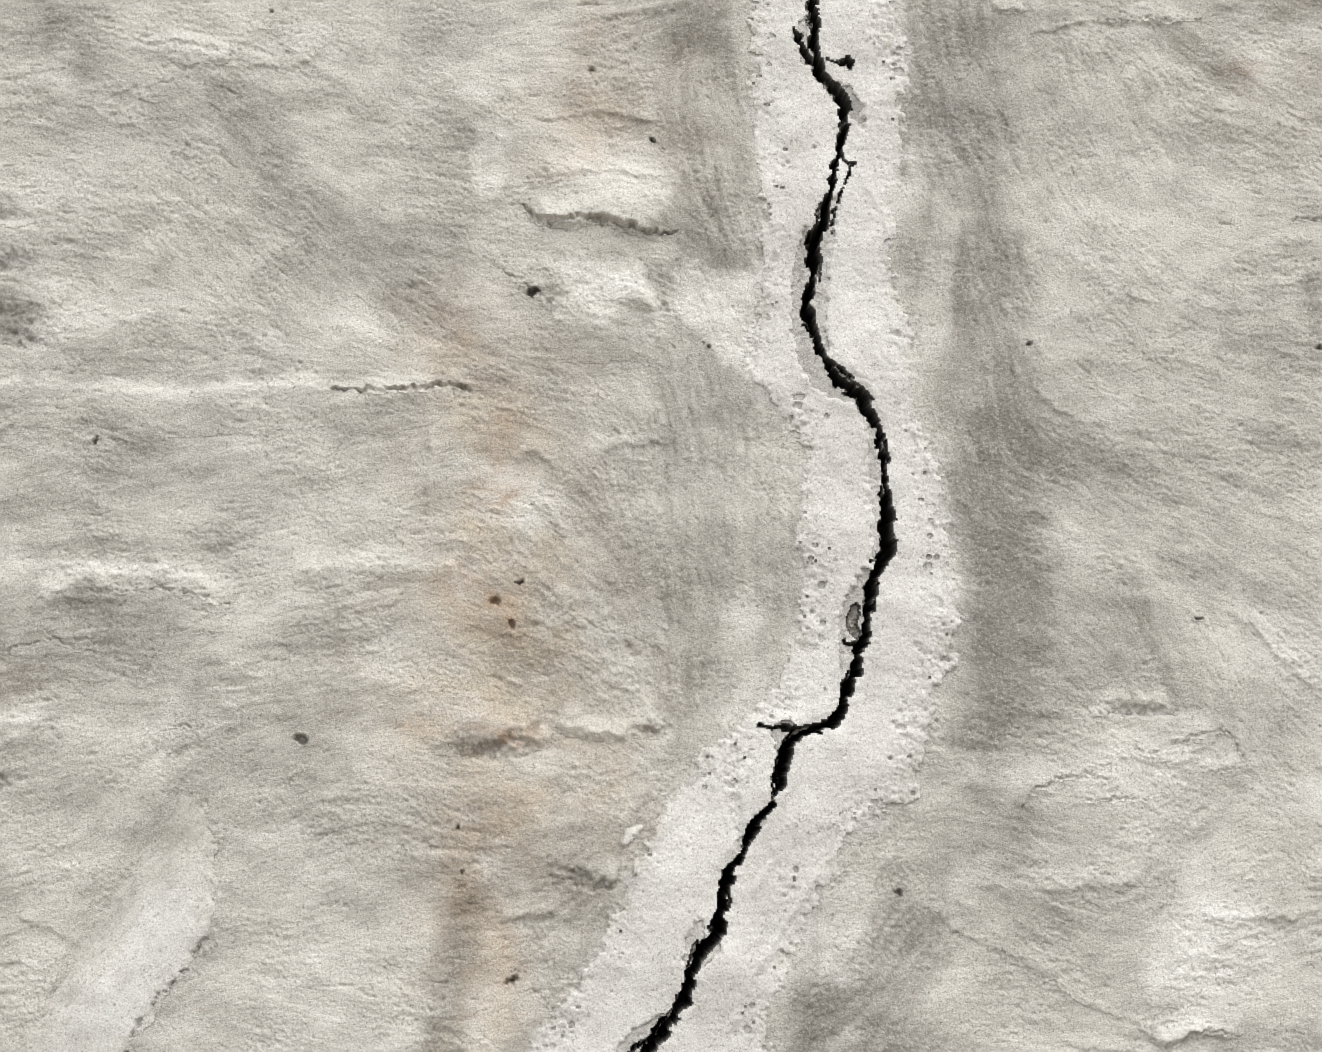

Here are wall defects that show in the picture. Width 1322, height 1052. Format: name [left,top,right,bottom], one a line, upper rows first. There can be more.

crack [522,203,679,237]
crack [627,0,899,1052]